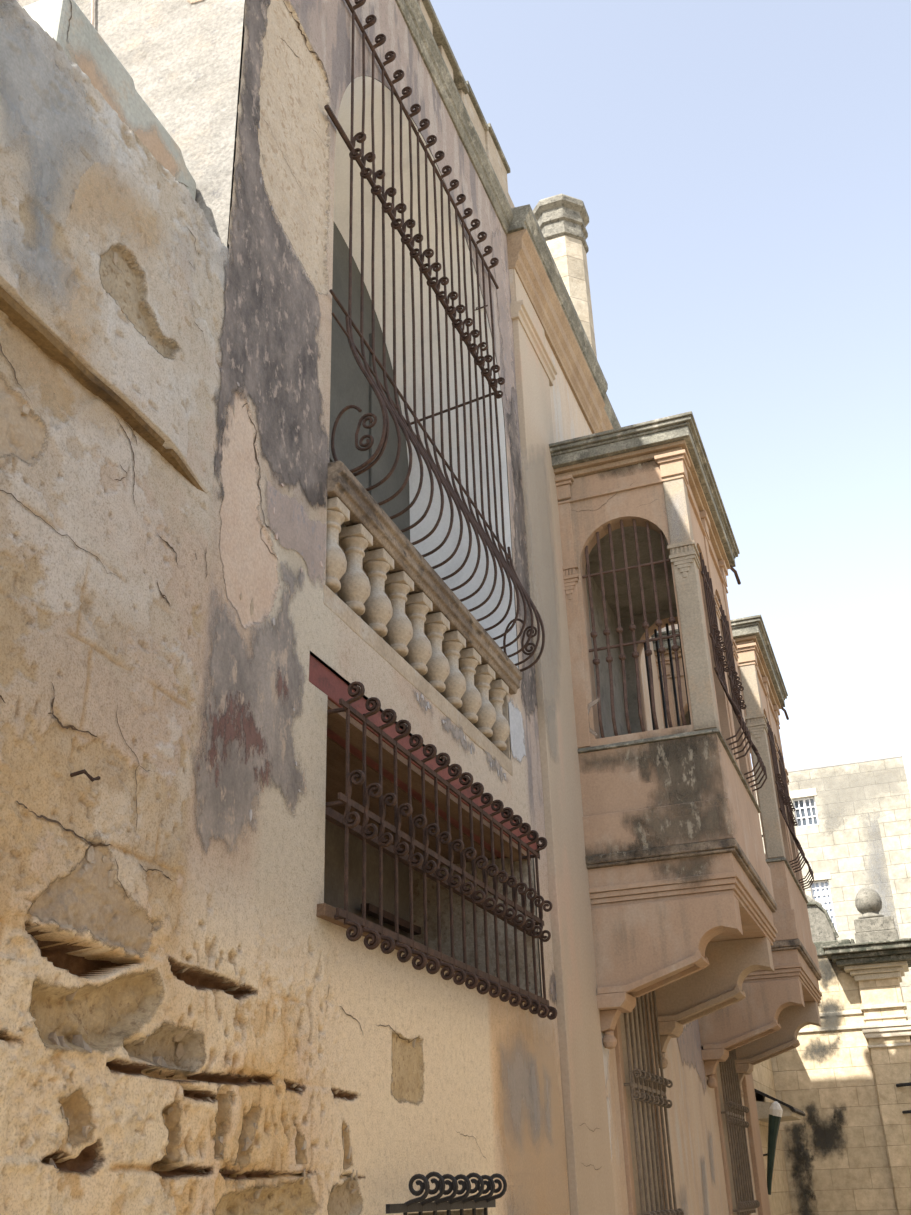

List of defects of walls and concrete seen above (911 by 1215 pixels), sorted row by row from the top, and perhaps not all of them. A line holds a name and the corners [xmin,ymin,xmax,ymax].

flaking render [99,245,182,359]
crack [114,416,138,505]
peeling [194,0,330,852]
crack [0,490,119,577]
crack [157,535,207,607]
crack [16,682,172,902]
leakage [585,732,730,883]
spalling [25,831,206,1084]
leakage [805,958,841,1061]
flaking render [391,1032,425,1105]
spalling [213,1125,363,1215]
leakage [786,1104,844,1215]